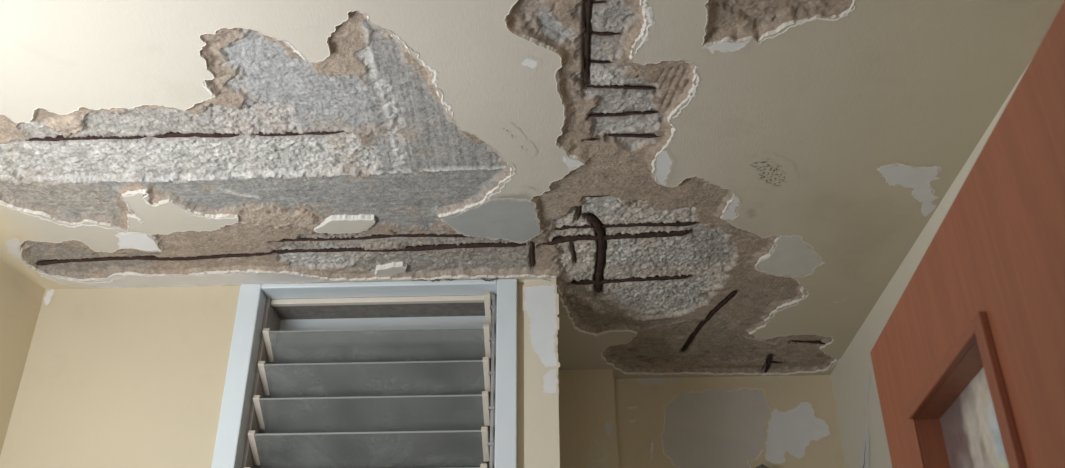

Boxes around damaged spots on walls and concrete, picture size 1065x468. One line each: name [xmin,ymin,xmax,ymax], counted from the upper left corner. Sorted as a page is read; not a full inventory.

spalling [0,0,856,396]
peeling [873,163,944,218]
peeling [763,400,833,467]